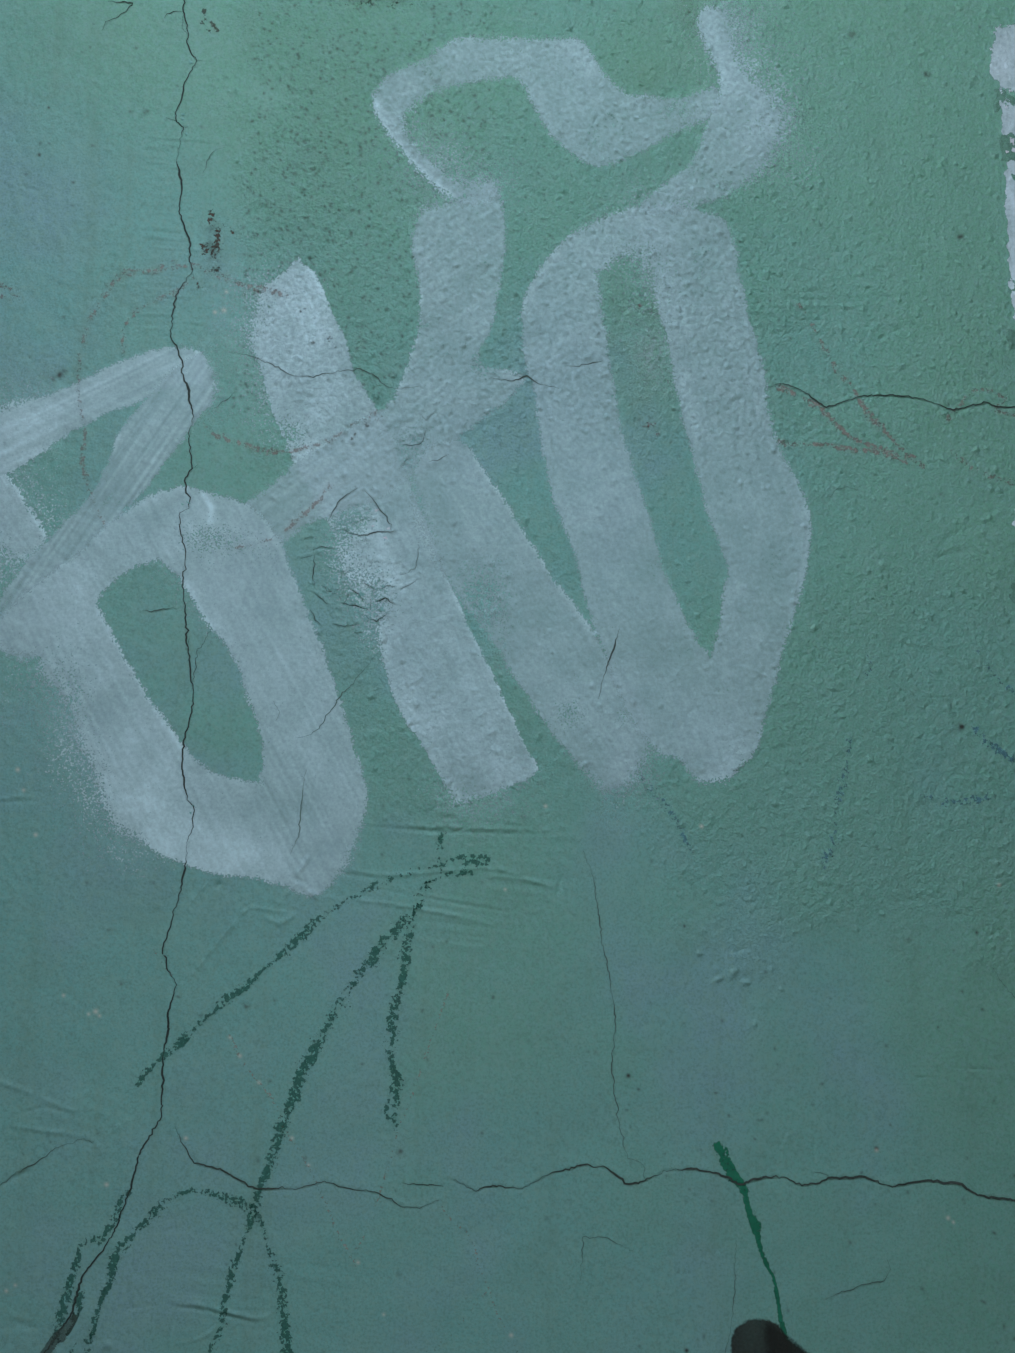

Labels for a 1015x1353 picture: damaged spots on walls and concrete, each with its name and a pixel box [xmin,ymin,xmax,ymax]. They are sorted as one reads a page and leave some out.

crack [489,361,601,388]
crack [770,383,1015,411]
crack [44,0,441,1353]
crack [598,631,619,699]
crack [464,851,1015,1203]